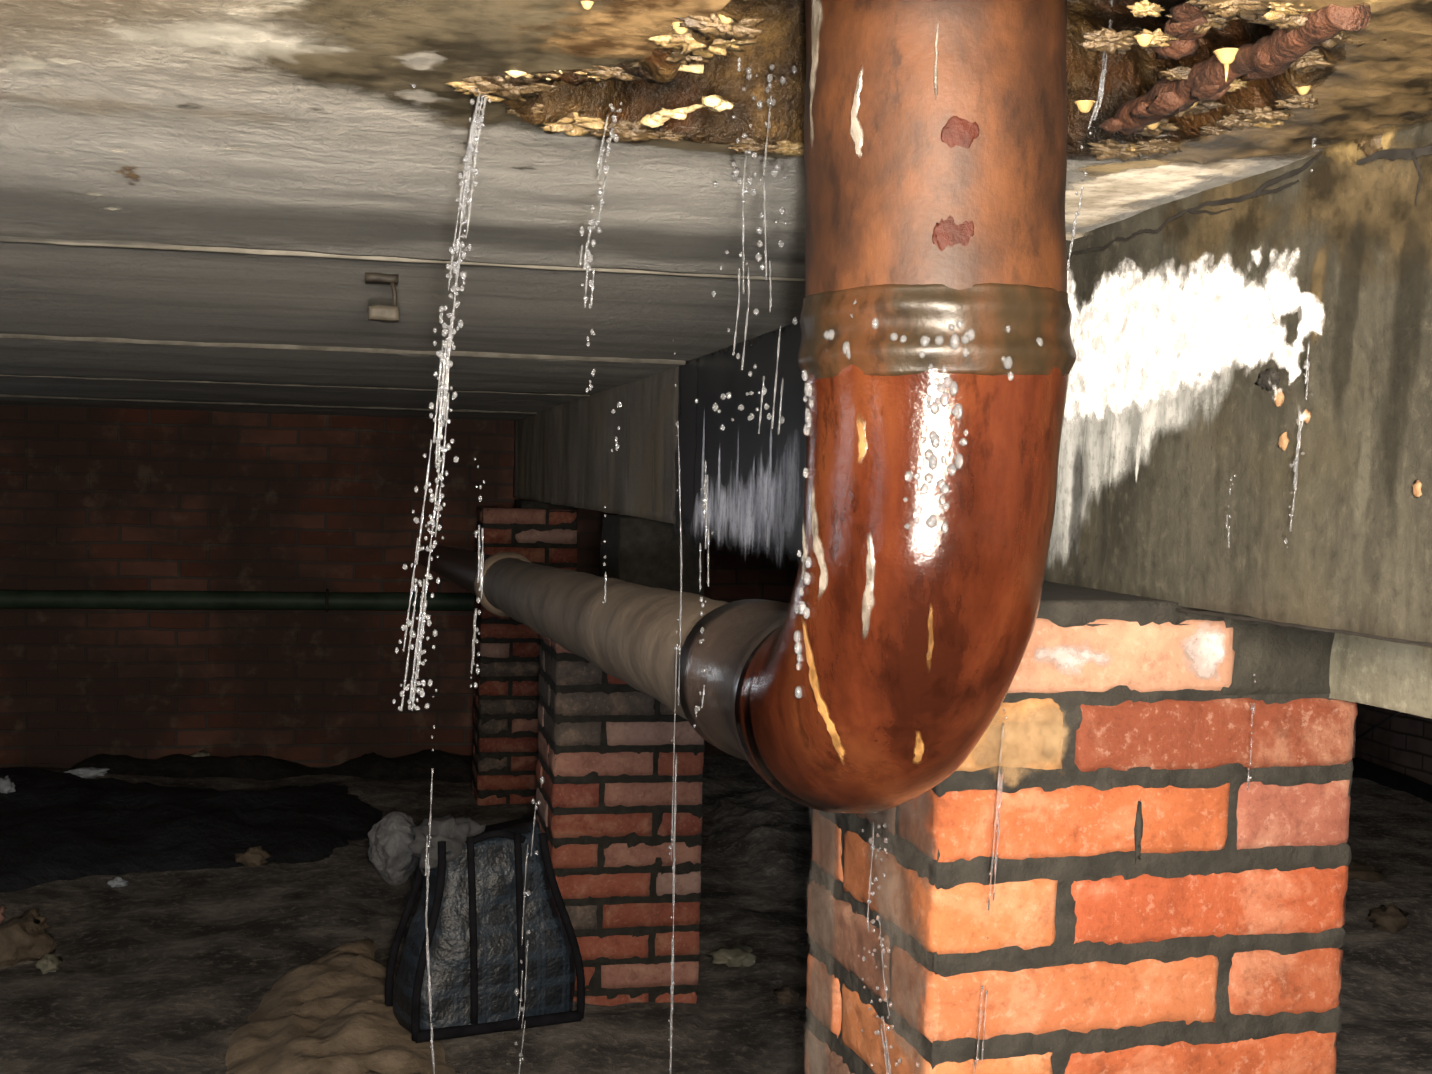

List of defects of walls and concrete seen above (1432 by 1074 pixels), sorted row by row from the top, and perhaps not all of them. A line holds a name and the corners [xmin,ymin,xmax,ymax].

damp [246,0,645,130]
spalling [445,0,806,157]
rust [536,0,731,57]
damp [576,95,793,159]
damp [678,63,704,74]
damp [809,0,821,138]
damp [850,70,862,155]
spalling [1065,0,1386,240]
rust [1100,0,1371,135]
damp [1138,0,1432,165]
damp [1048,251,1325,559]